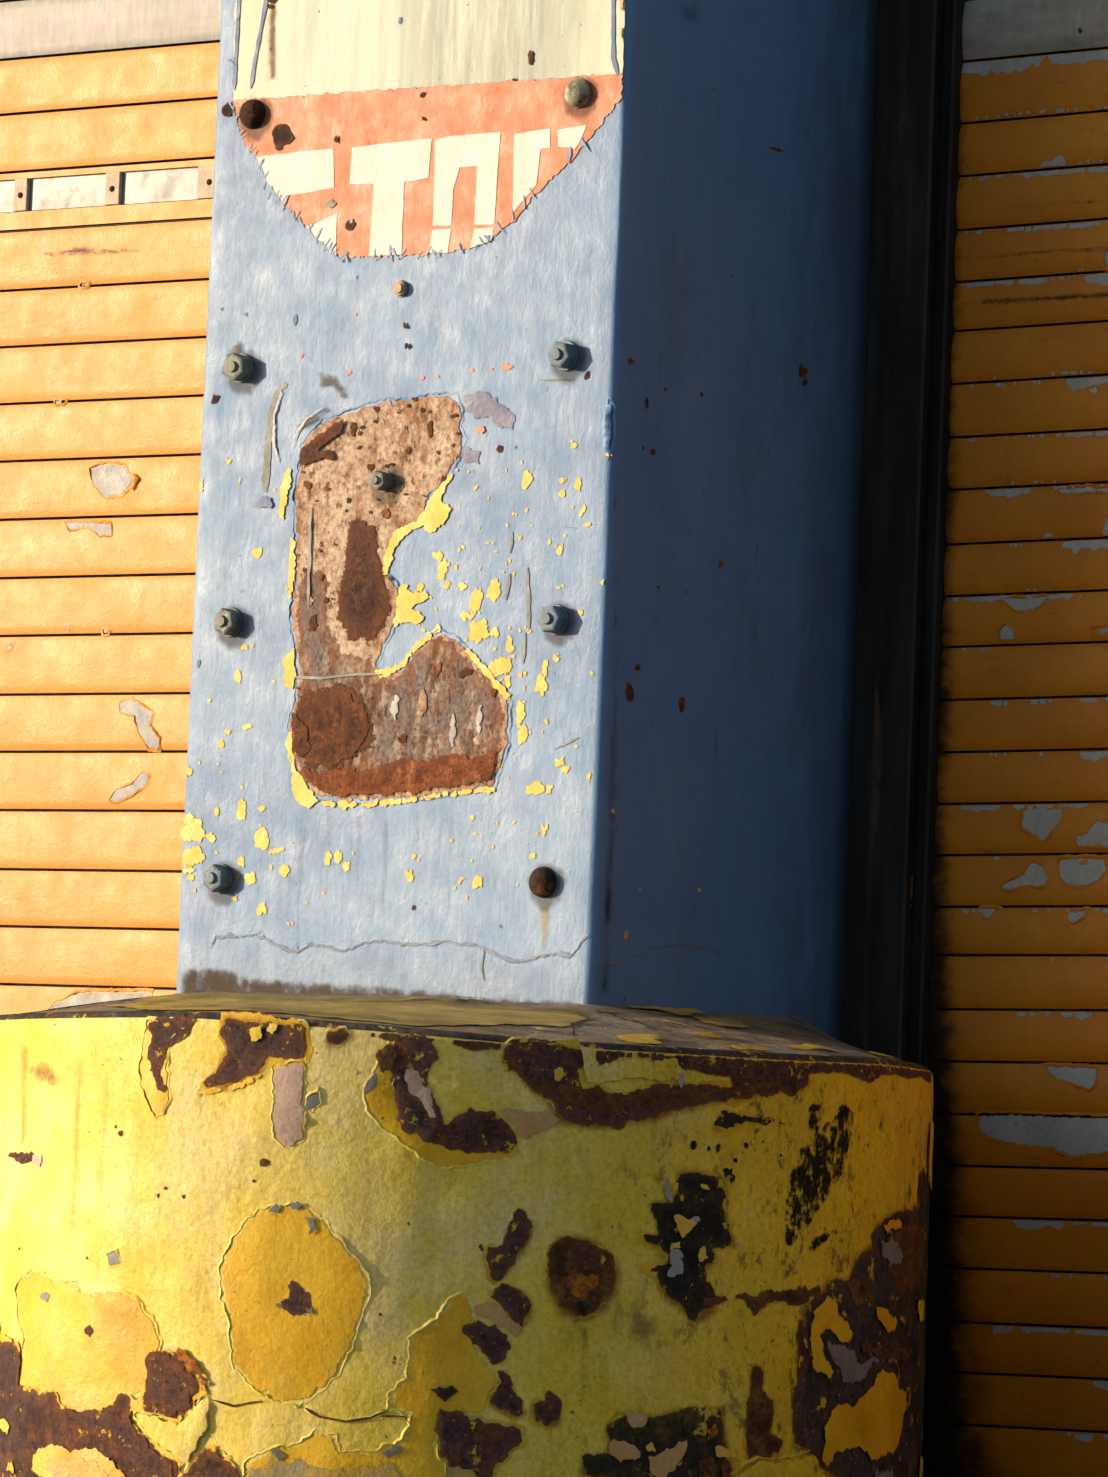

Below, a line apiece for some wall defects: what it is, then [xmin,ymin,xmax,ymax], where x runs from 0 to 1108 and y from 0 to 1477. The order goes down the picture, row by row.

corrosion [286,391,514,805]
peeling [285,425,559,810]
peeling [137,1013,196,1119]
corrosion [194,1011,353,1150]
corrosion [370,1033,429,1041]
crack [210,931,591,981]
peeling [362,1031,523,1171]
peeling [14,1266,215,1474]
corrosion [0,1312,242,1477]
peeling [217,1200,382,1409]
peeling [242,1291,501,1477]
corrosion [434,1035,934,1477]